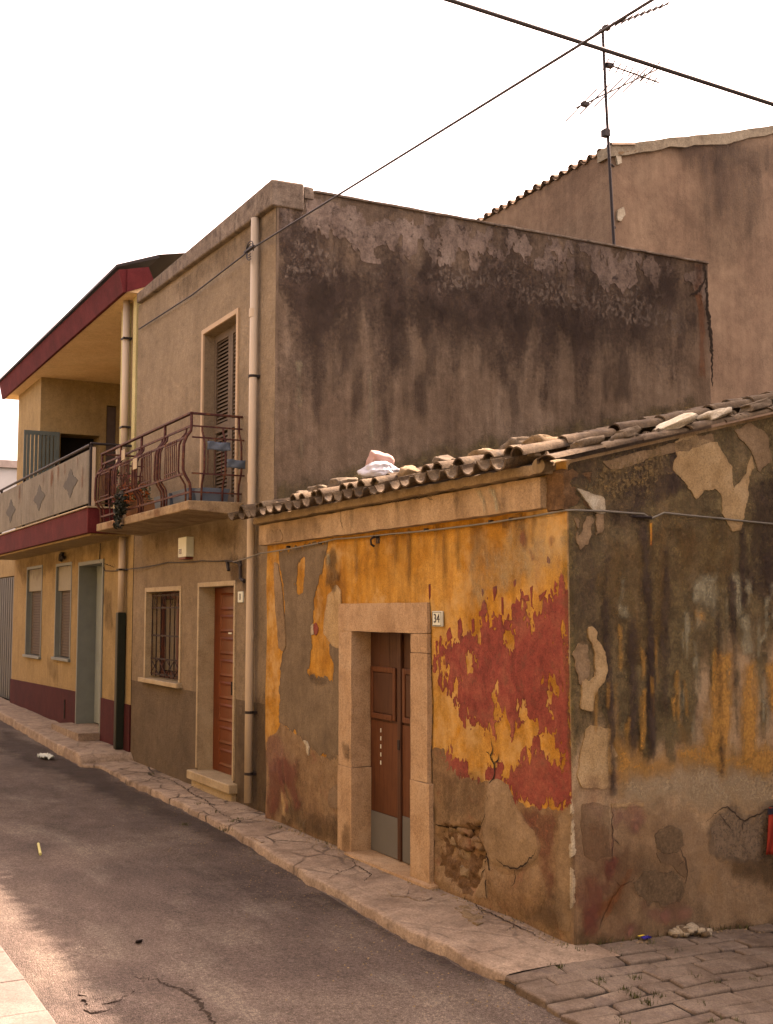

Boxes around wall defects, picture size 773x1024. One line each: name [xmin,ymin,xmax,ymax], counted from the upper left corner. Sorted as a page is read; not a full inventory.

damp [278,213,697,381]
peeling [279,199,708,304]
crack [690,264,714,386]
damp [394,437,503,469]
damp [535,398,695,437]
peeling [603,407,772,531]
damp [568,417,773,828]
crack [142,768,255,827]
crack [429,599,544,940]
peeling [431,573,618,943]
crack [707,806,773,831]
crack [135,976,216,1024]